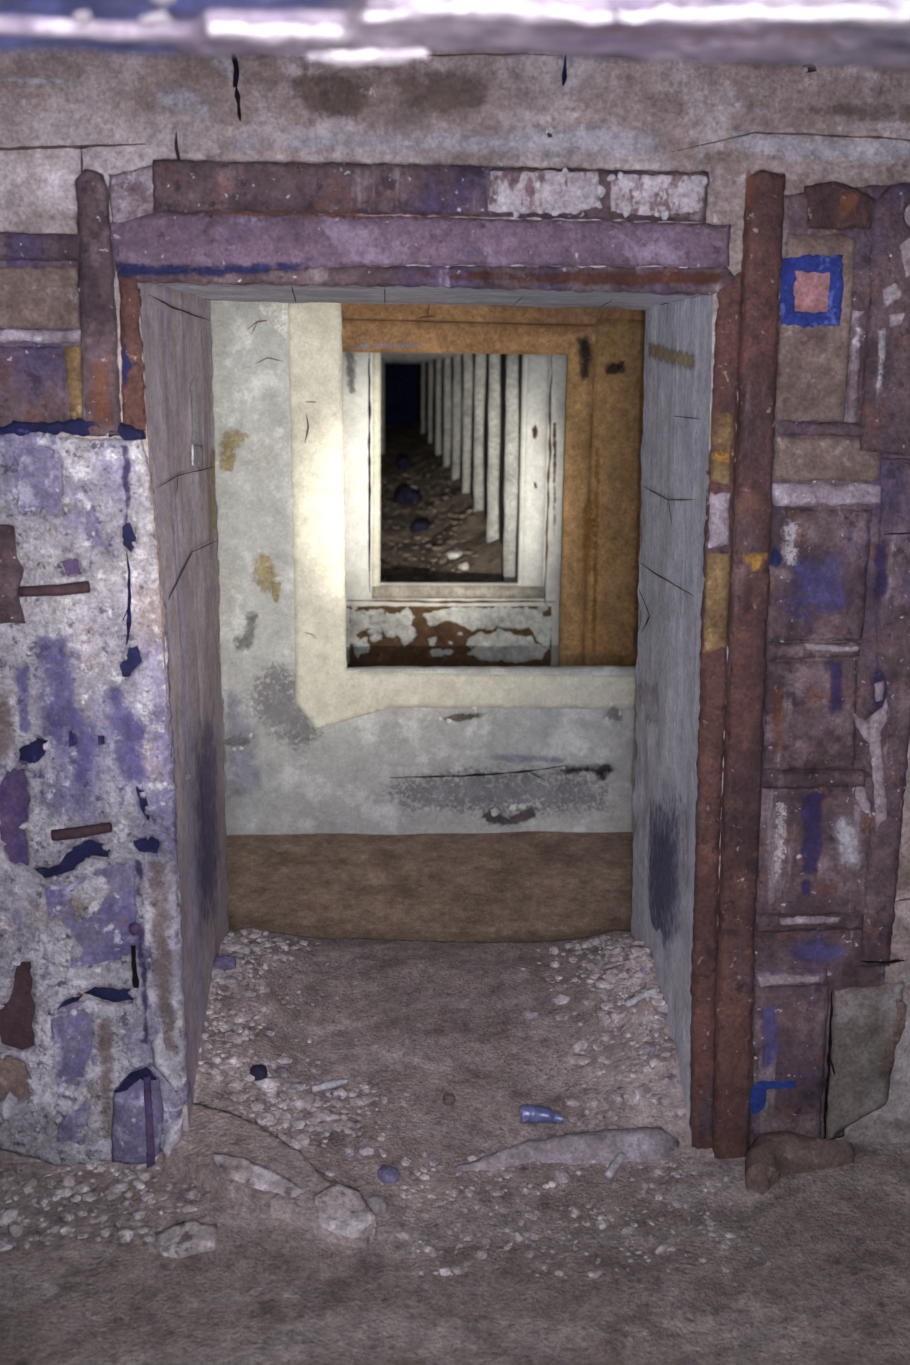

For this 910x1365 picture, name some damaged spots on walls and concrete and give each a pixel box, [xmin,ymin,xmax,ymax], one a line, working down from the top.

spalling [0,0,910,73]
crack [232,56,241,121]
crack [425,53,567,86]
corrosion [509,271,723,285]
corrosion [745,554,766,571]
peeling [346,603,552,668]